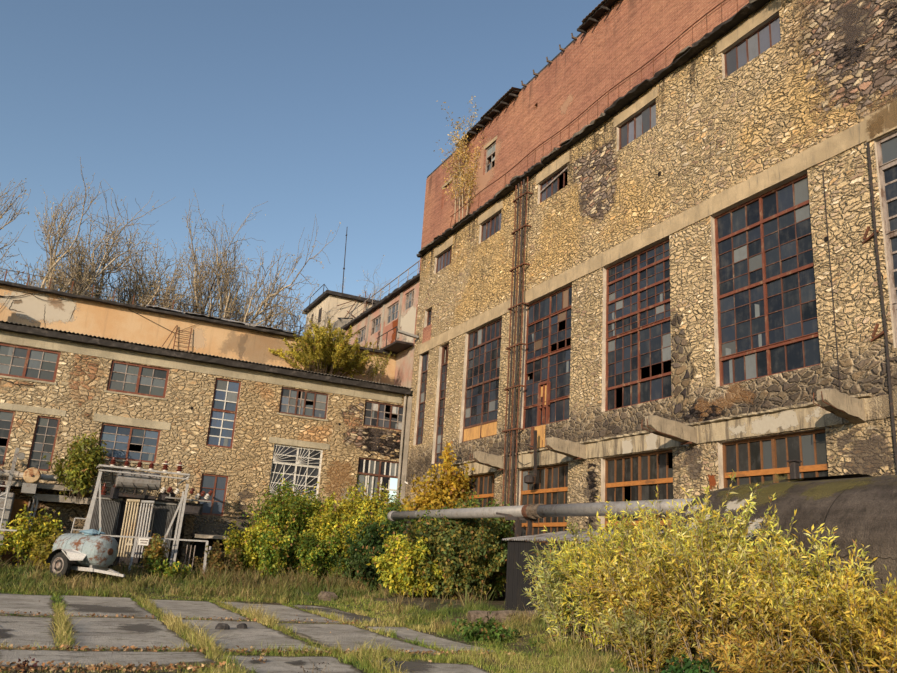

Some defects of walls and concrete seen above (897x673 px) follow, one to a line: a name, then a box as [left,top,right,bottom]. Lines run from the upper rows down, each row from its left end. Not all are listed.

damp [828,0,897,77]
damp [867,92,897,138]
spalling [572,140,617,222]
peeling [0,290,79,323]
spalling [338,403,405,455]